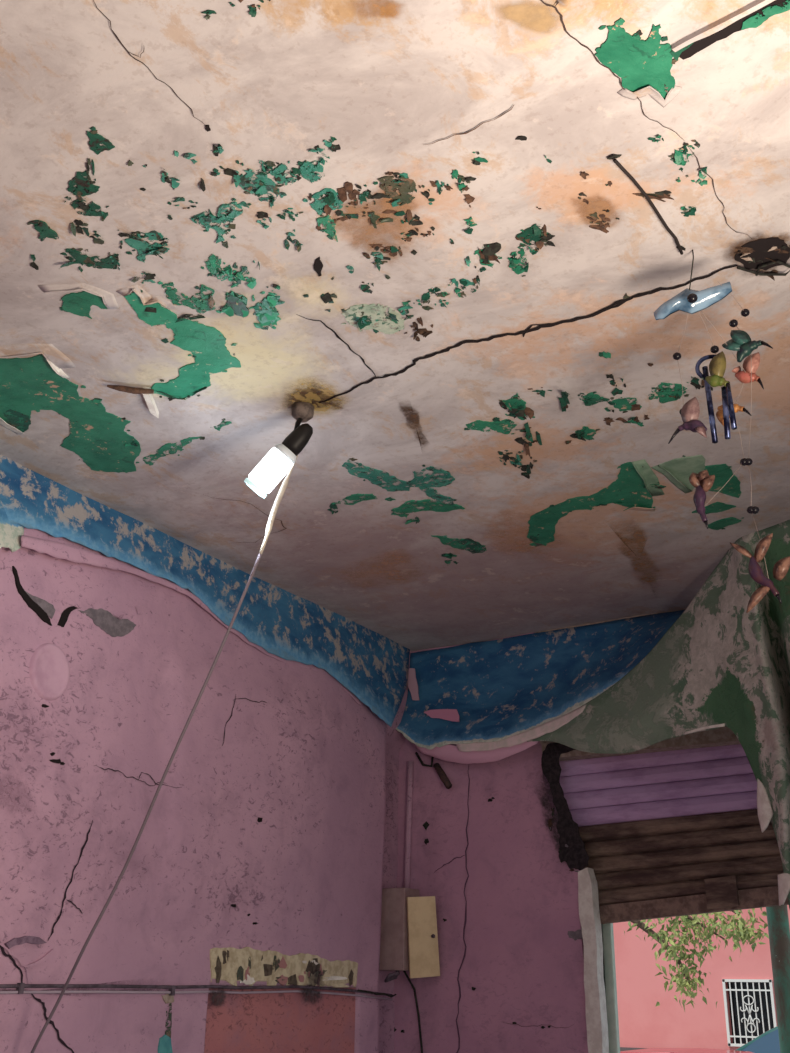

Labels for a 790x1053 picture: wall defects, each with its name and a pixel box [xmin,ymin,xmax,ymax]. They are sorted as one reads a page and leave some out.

leakage [361,2,398,17]
leakage [501,4,556,32]
peeling [595,18,682,108]
crack [540,0,752,239]
crack [670,0,790,61]
peeling [27,126,488,418]
peeling [303,224,555,342]
crack [296,265,738,403]
peeling [0,344,231,473]
peeling [0,454,790,909]
crack [48,820,93,940]
crack [0,942,74,1053]